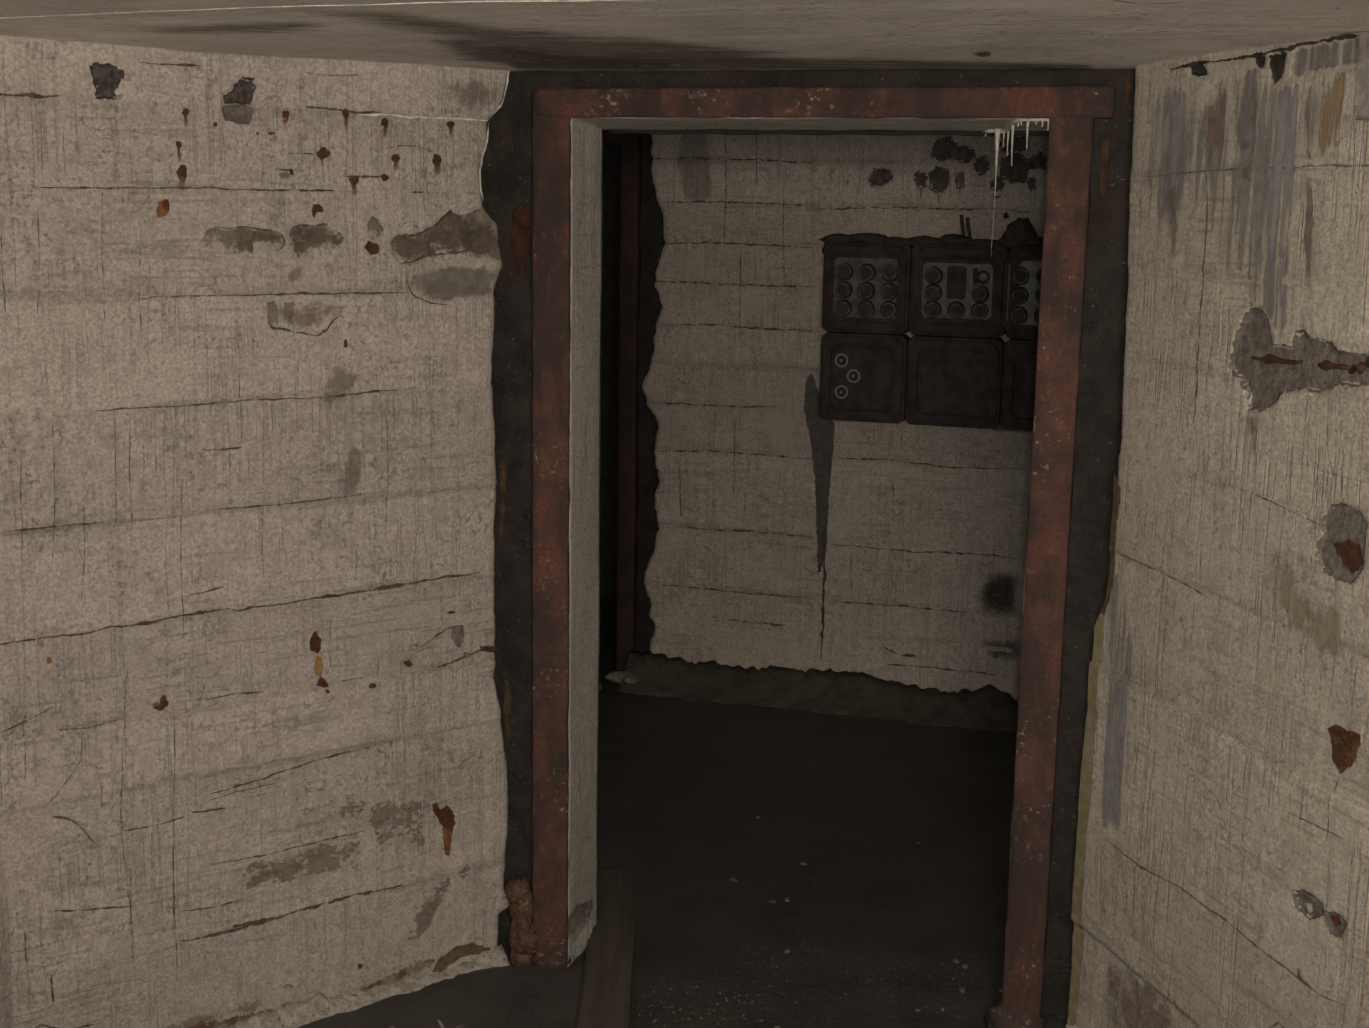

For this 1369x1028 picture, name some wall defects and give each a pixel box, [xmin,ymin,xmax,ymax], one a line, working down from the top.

leakage [166,25,309,33]
leakage [337,14,1094,72]
spalling [90,62,125,99]
spalling [222,76,256,125]
rust [176,141,187,190]
rust [346,154,401,195]
leakage [1149,32,1369,335]
peeling [364,208,501,305]
spalling [1229,307,1369,412]
spalling [1315,473,1368,585]
rust [1326,725,1361,852]
rust [432,802,456,856]